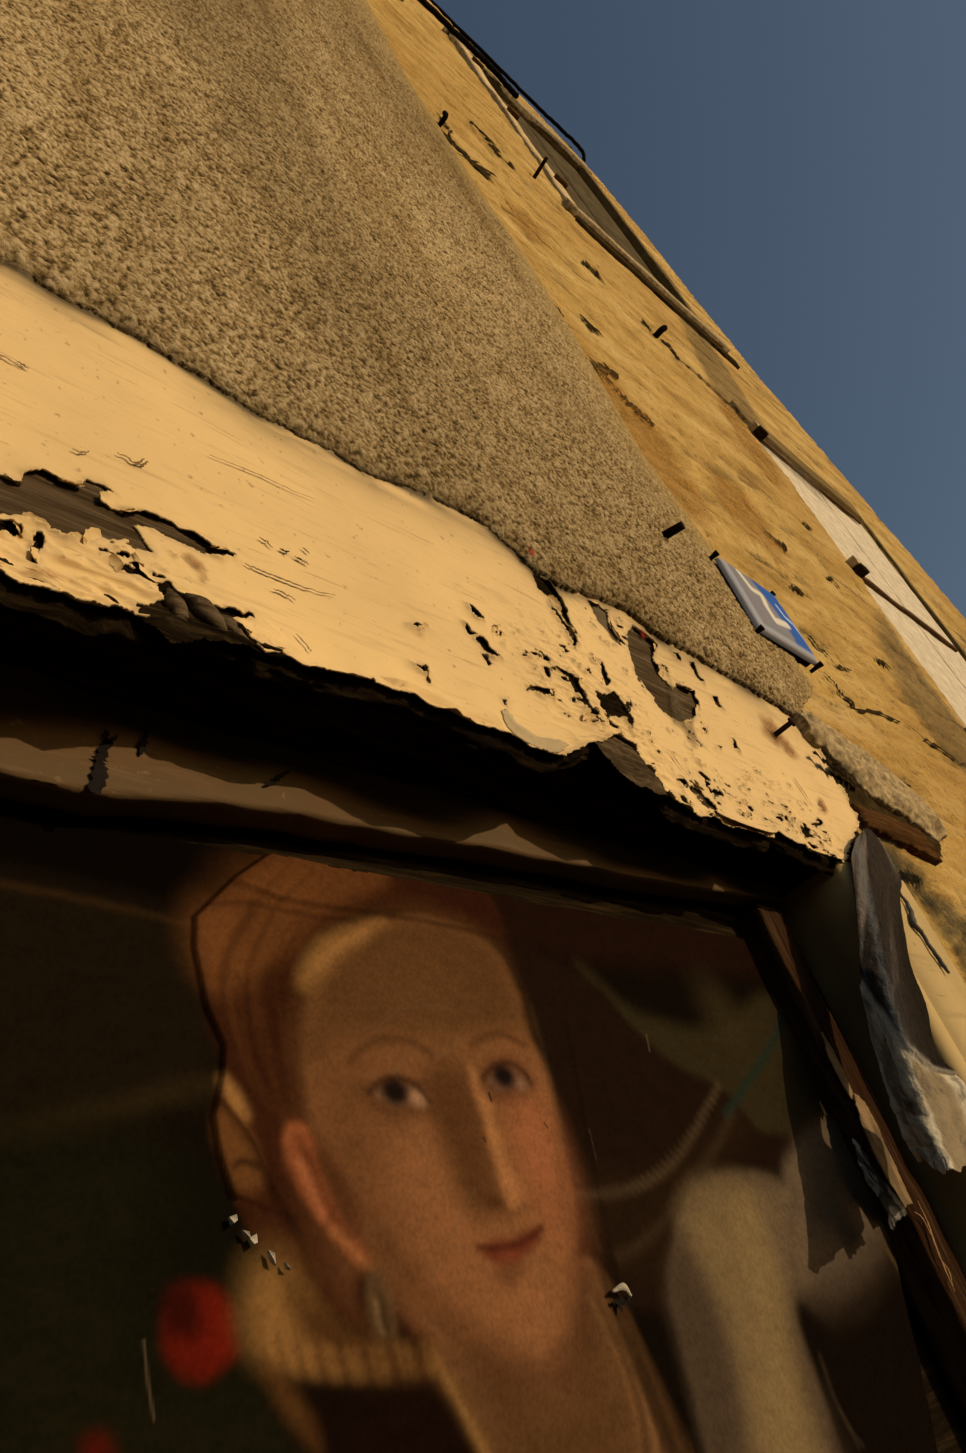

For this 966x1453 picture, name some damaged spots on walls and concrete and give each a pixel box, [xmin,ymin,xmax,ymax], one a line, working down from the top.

peeling [0,470,291,660]
peeling [465,610,499,666]
peeling [533,575,577,646]
peeling [589,600,721,722]
peeling [501,700,569,753]
peeling [526,666,821,838]